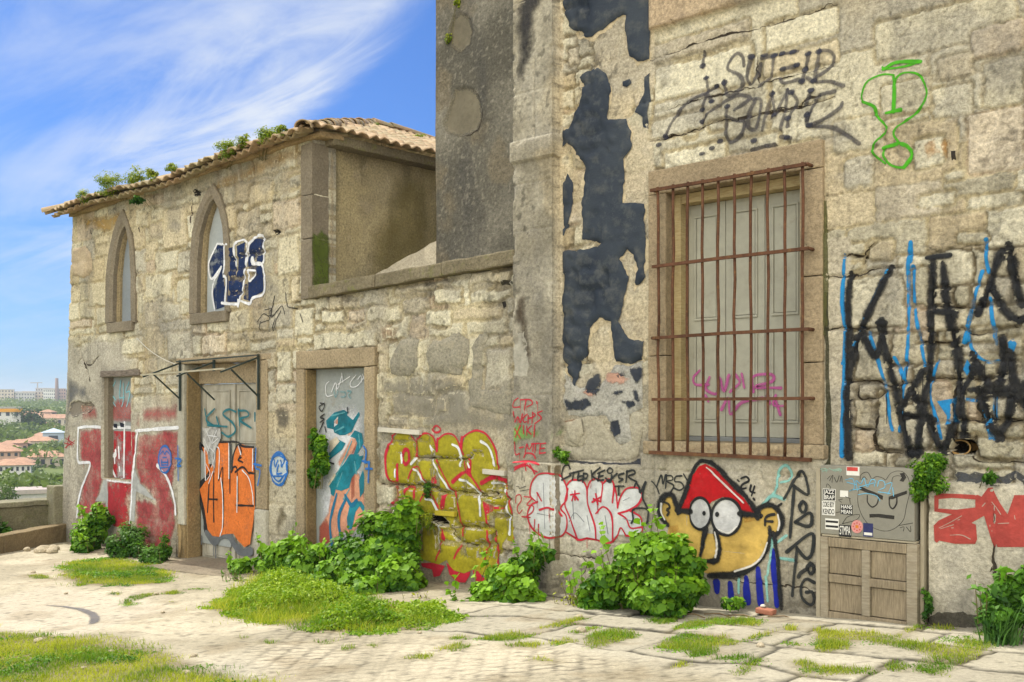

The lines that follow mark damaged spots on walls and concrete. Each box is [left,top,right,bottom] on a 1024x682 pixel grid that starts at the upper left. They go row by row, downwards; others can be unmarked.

crack [650,3,838,61]
peeling [561,0,652,461]
spalling [69,401,94,417]